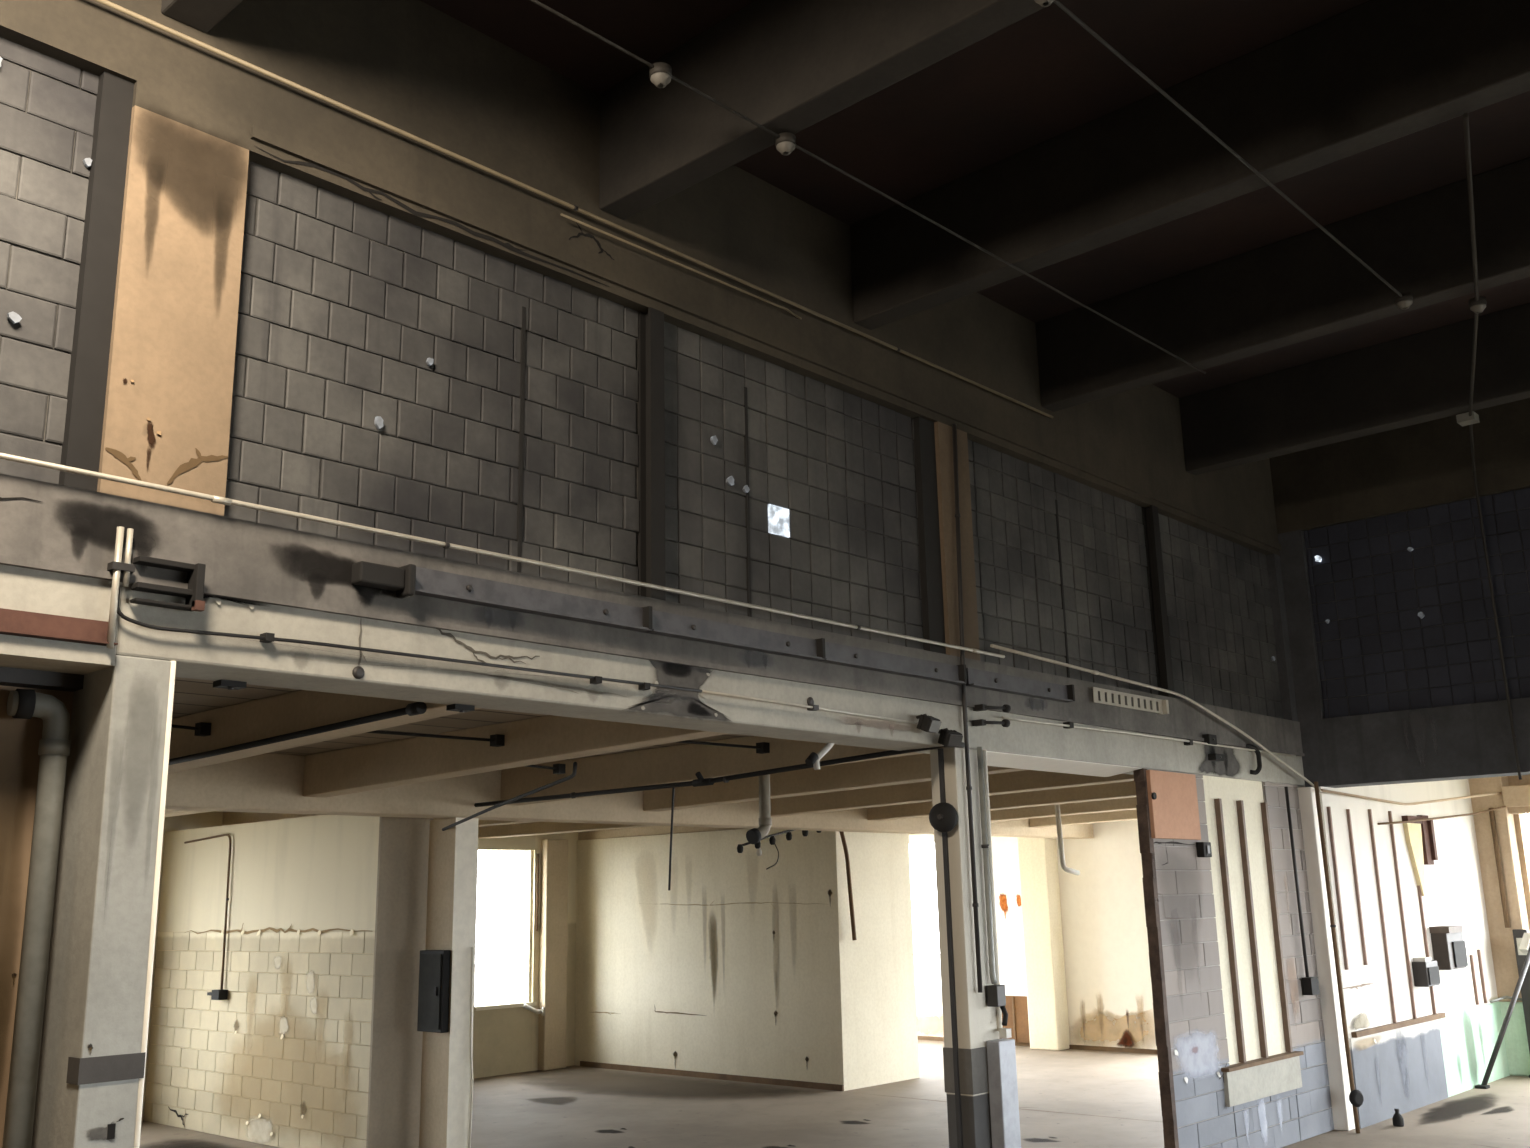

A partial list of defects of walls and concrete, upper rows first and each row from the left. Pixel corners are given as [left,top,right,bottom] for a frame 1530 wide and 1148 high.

crack [0,495,42,503]
leakage [73,530,87,555]
leakage [310,576,325,596]